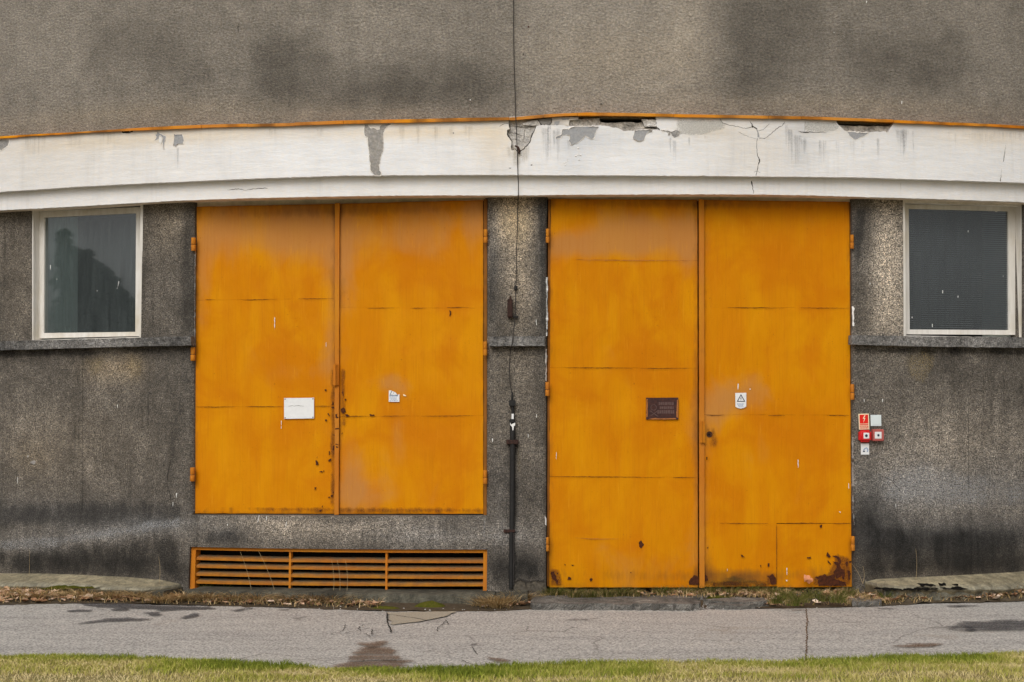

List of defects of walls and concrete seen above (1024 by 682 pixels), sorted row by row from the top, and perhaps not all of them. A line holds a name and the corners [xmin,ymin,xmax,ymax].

peeling [155,131,184,149]
peeling [363,123,393,176]
spalling [507,116,723,151]
crack [720,119,785,194]
flaking render [799,122,891,140]
rust [298,371,375,512]
rust [814,552,851,586]